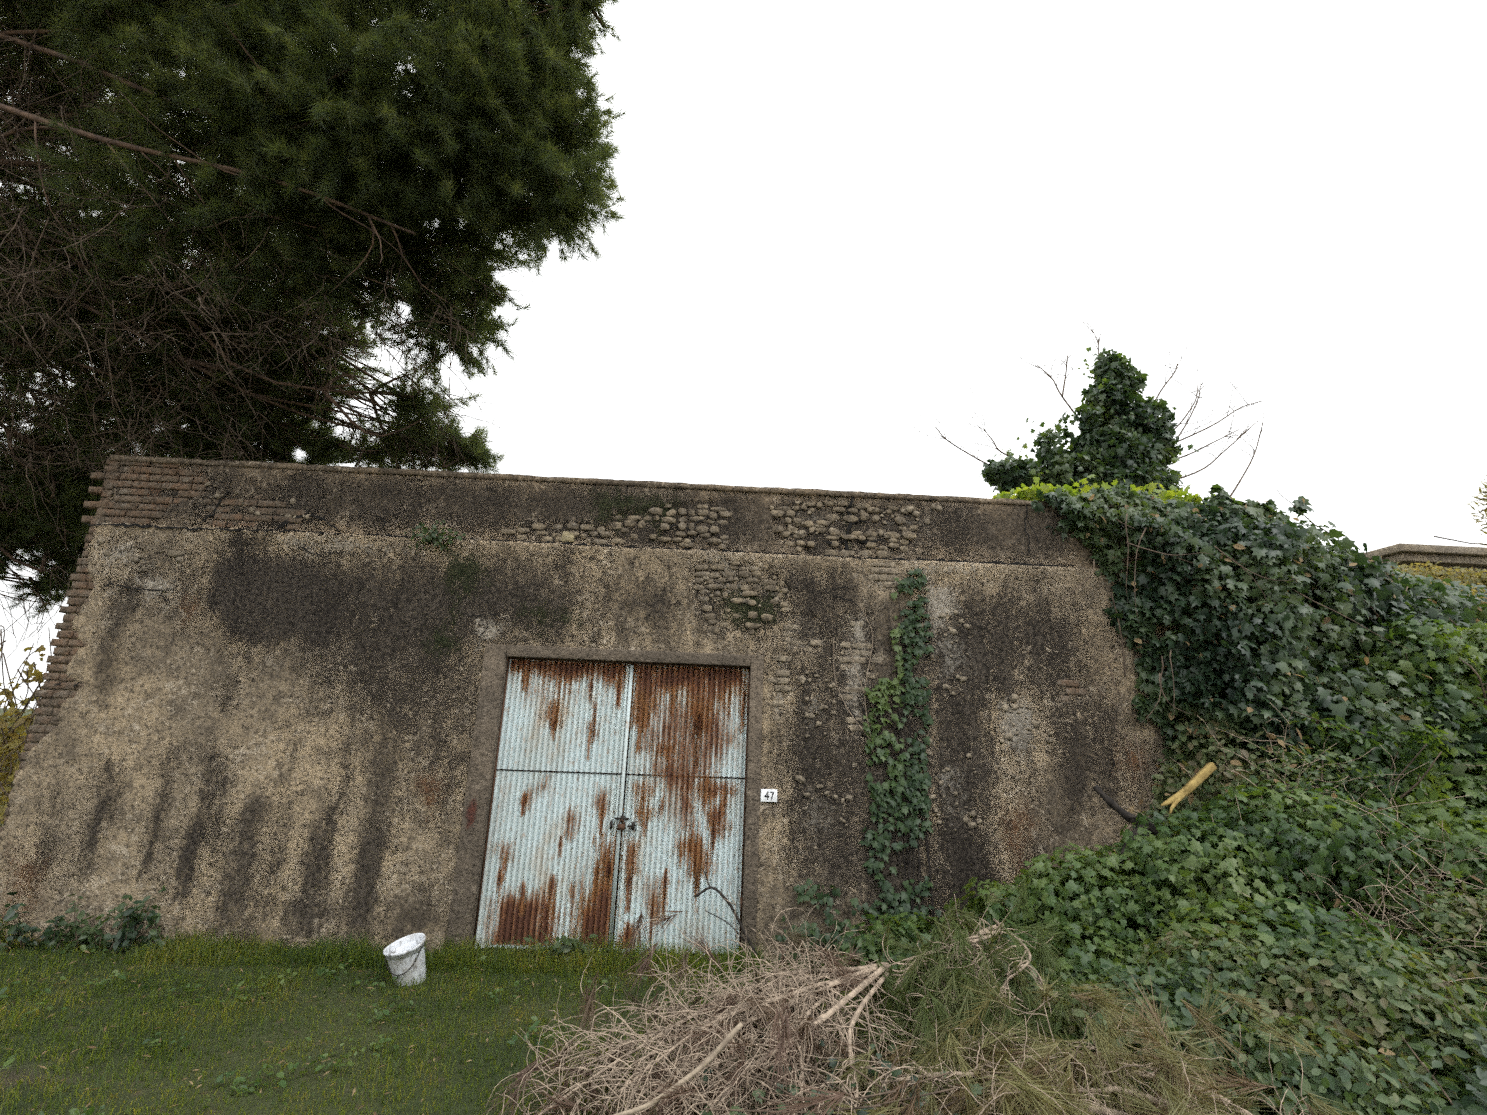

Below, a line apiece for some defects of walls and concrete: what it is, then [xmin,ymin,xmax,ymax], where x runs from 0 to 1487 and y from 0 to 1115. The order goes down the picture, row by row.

damp [87,768,119,865]
damp [102,475,1117,940]
rust [486,659,748,949]